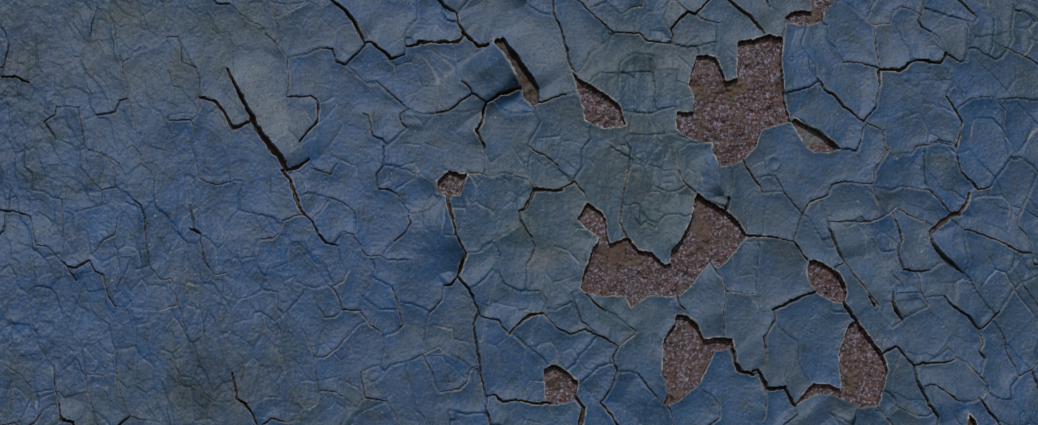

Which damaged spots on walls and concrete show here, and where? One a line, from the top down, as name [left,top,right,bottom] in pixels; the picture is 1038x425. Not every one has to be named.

peeling [570,69,629,131]
crack [525,0,787,105]
peeling [674,0,843,169]
crack [0,0,188,334]
crack [166,0,675,425]
peeling [575,191,749,311]
peeling [804,258,850,306]
crack [744,0,1038,425]
crack [3,339,172,425]
peeling [660,313,737,409]
crack [713,268,815,425]
peeling [791,317,891,425]